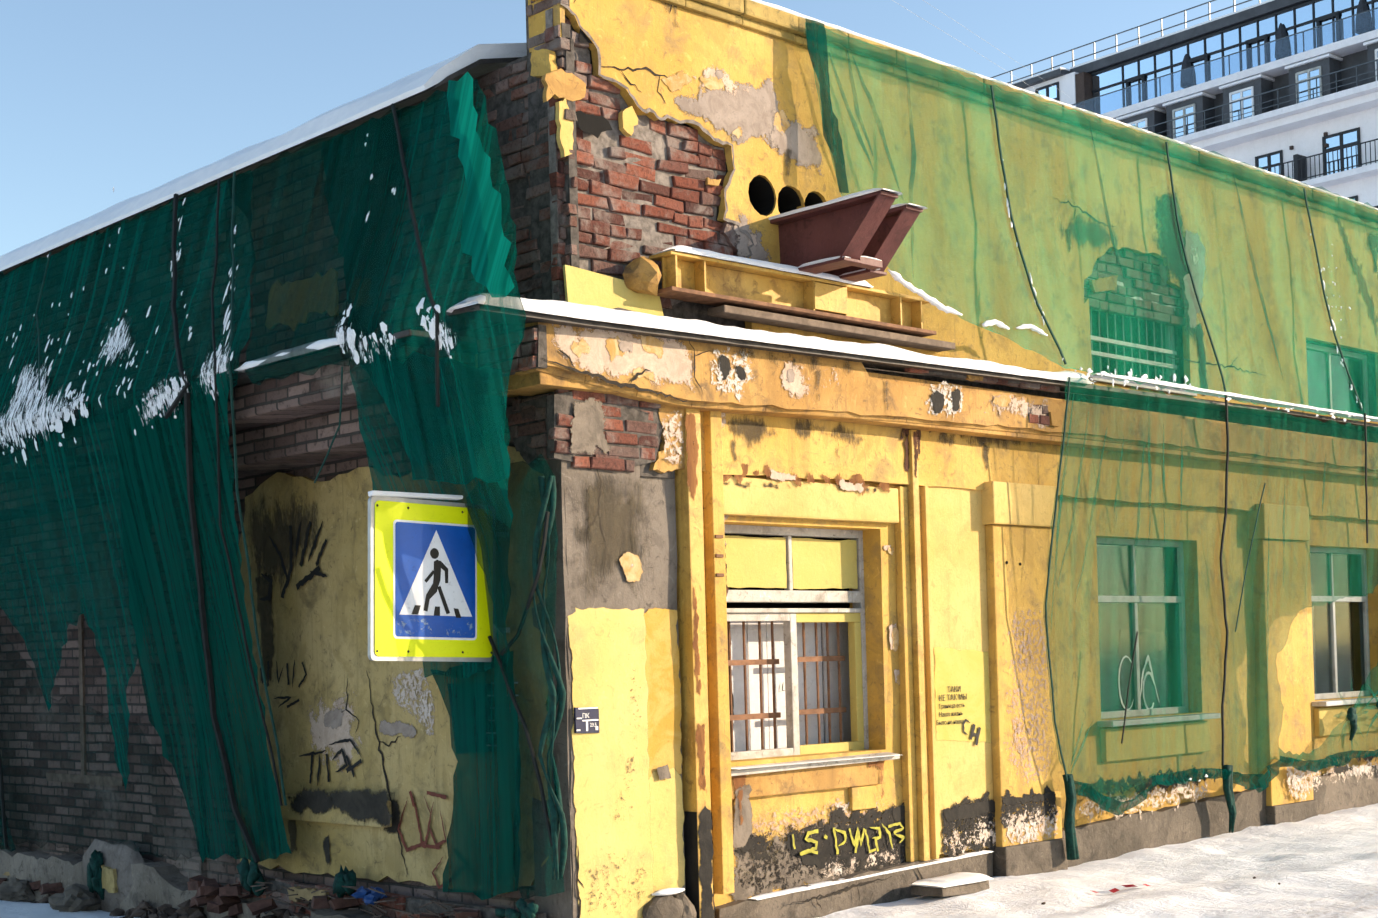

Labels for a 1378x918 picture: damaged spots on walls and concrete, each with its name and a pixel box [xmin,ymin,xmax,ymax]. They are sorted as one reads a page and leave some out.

crack [601,66,668,104]
spalling [526,0,820,310]
spalling [506,324,755,474]
water stain [728,418,775,461]
water stain [795,419,814,437]
peeling [780,360,839,399]
water stain [831,425,863,453]
peeling [902,360,1060,429]
peeling [619,552,643,582]
peeling [309,692,362,773]
peeling [379,668,435,738]
water stain [288,787,401,852]